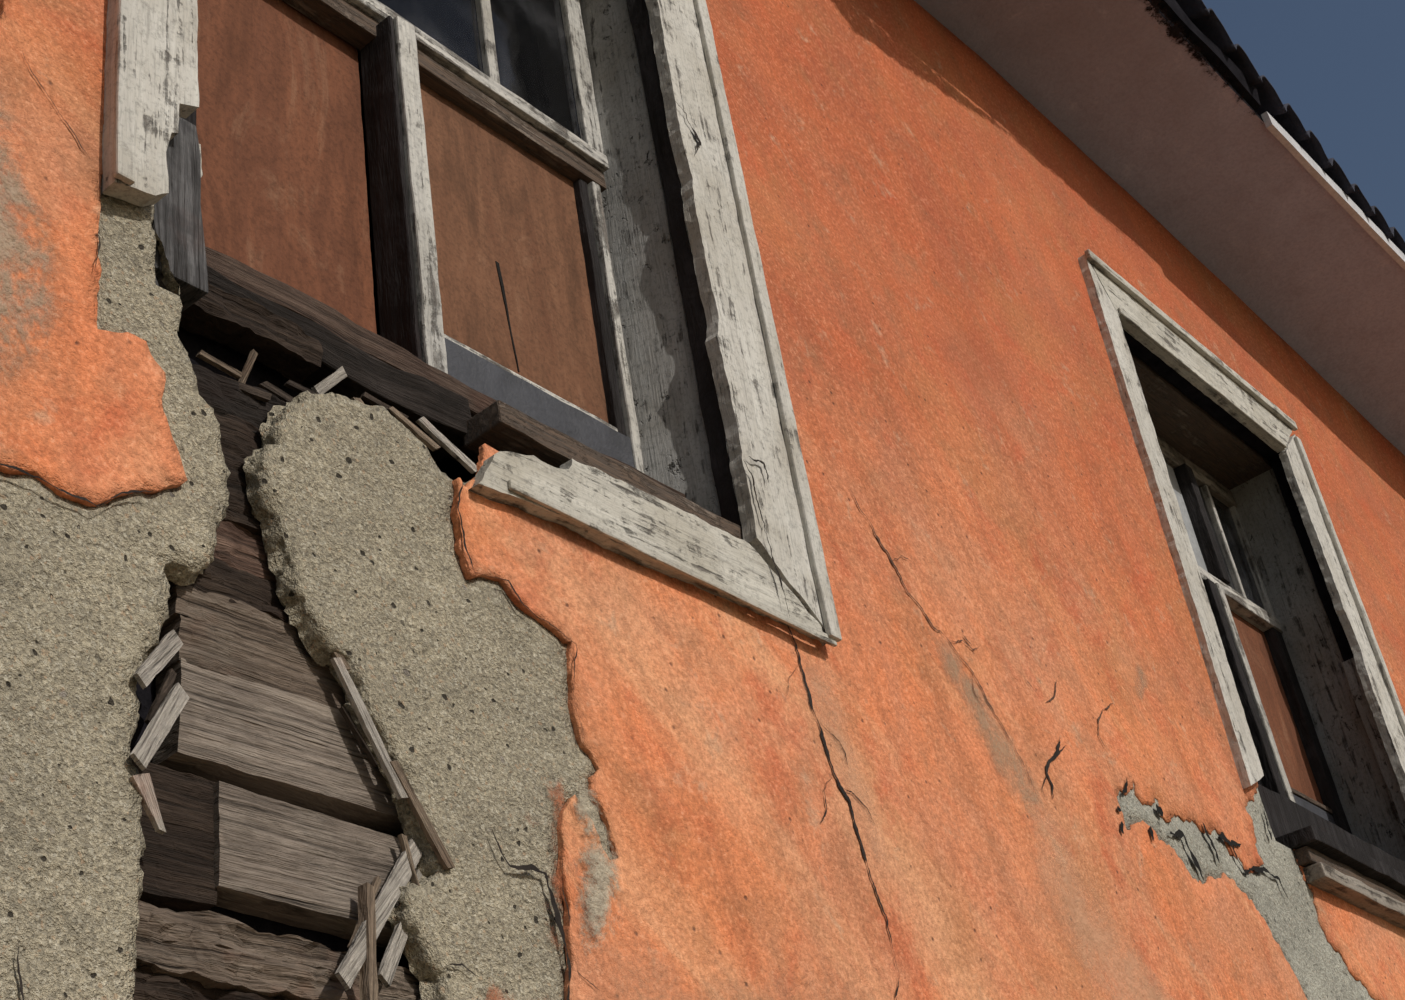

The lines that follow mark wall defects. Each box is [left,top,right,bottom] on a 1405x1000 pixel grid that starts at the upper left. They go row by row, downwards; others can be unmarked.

crack [674,100,701,153]
flaking render [0,177,619,1000]
crack [743,456,900,1000]
crack [853,495,1066,798]
crack [1098,703,1114,745]
crack [492,829,599,1000]
crack [1117,779,1288,898]
flaking render [1117,783,1375,1000]